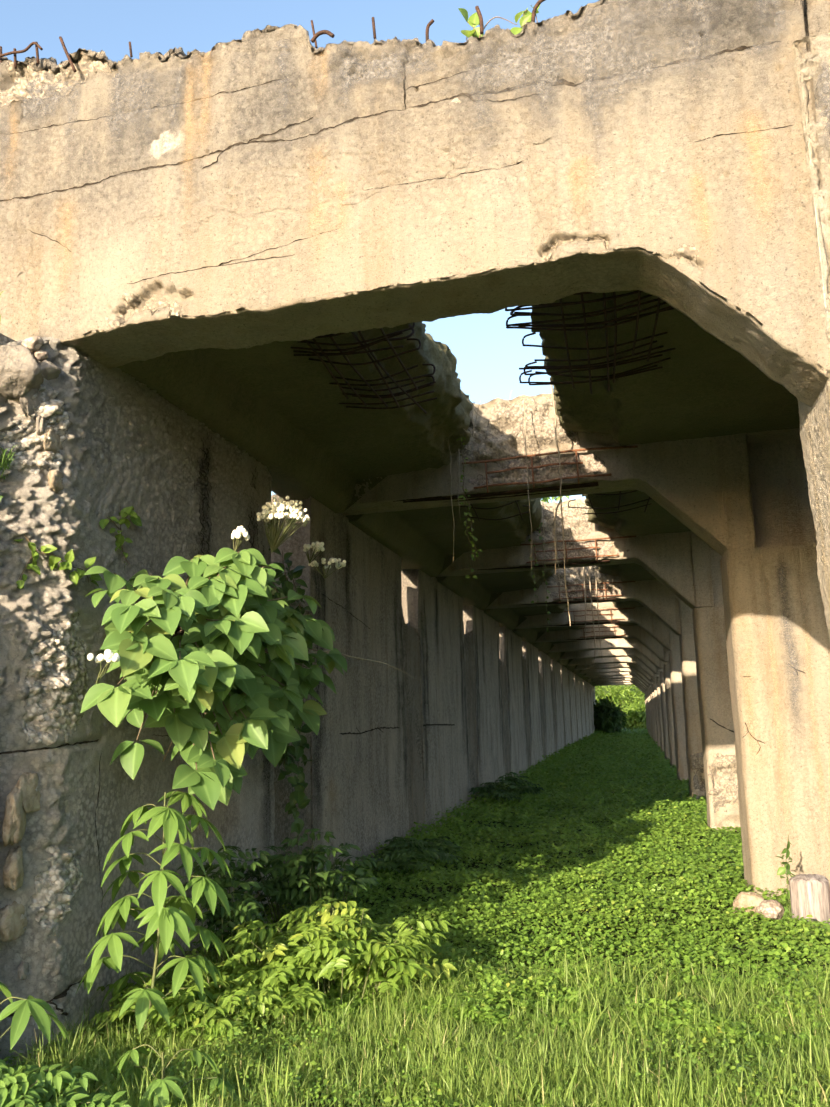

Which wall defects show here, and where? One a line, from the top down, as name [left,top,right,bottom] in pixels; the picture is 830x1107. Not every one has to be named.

spalling [0,49,118,107]
crack [0,41,792,202]
damp [815,64,830,136]
crack [127,229,337,284]